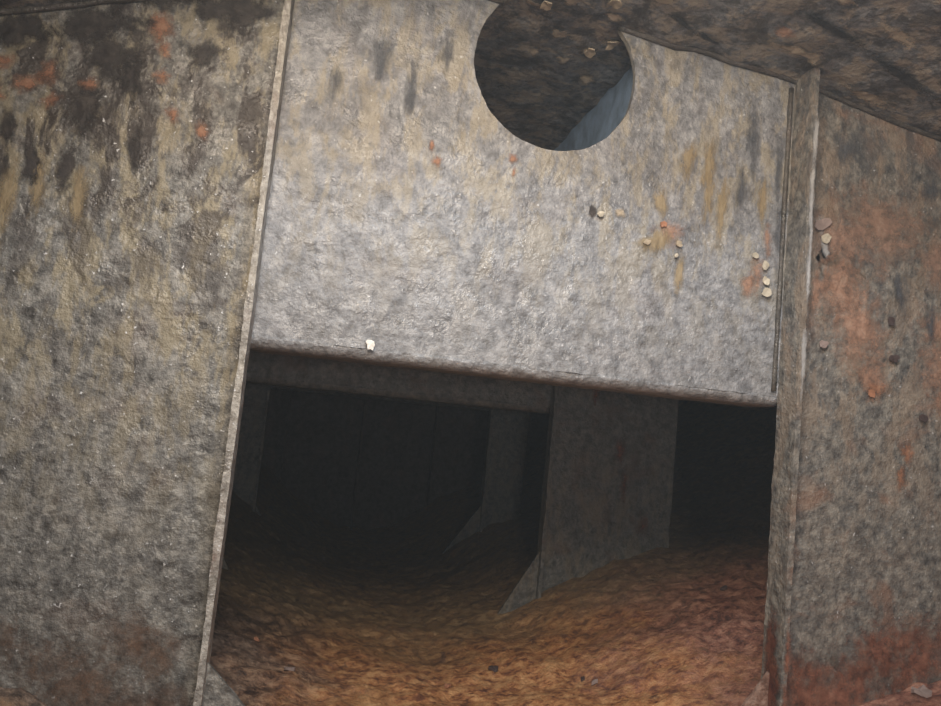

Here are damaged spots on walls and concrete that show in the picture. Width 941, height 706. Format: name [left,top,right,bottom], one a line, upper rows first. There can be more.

water stain [0,83,100,229]
water stain [127,129,142,169]
rust [764,613,790,706]